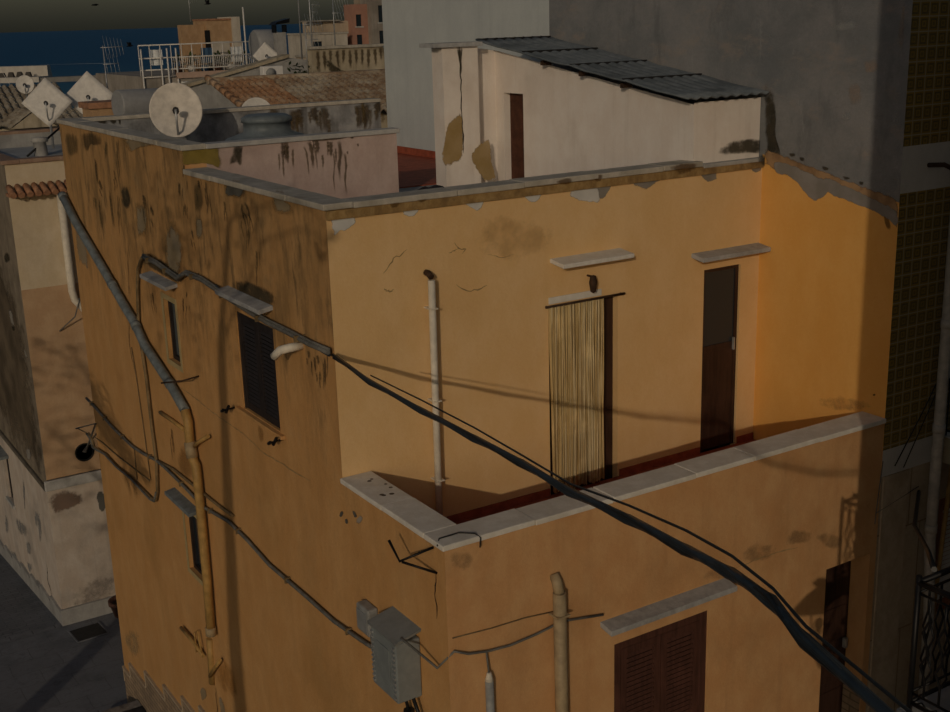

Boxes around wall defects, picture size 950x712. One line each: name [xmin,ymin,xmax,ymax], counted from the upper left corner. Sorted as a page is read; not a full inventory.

leakage [278,143,294,174]
leakage [290,108,359,186]
leakage [355,102,387,127]
crack [456,48,464,151]
flaking render [442,115,495,181]
leakage [723,94,780,166]
spalling [765,151,898,211]
flaking render [51,492,80,513]